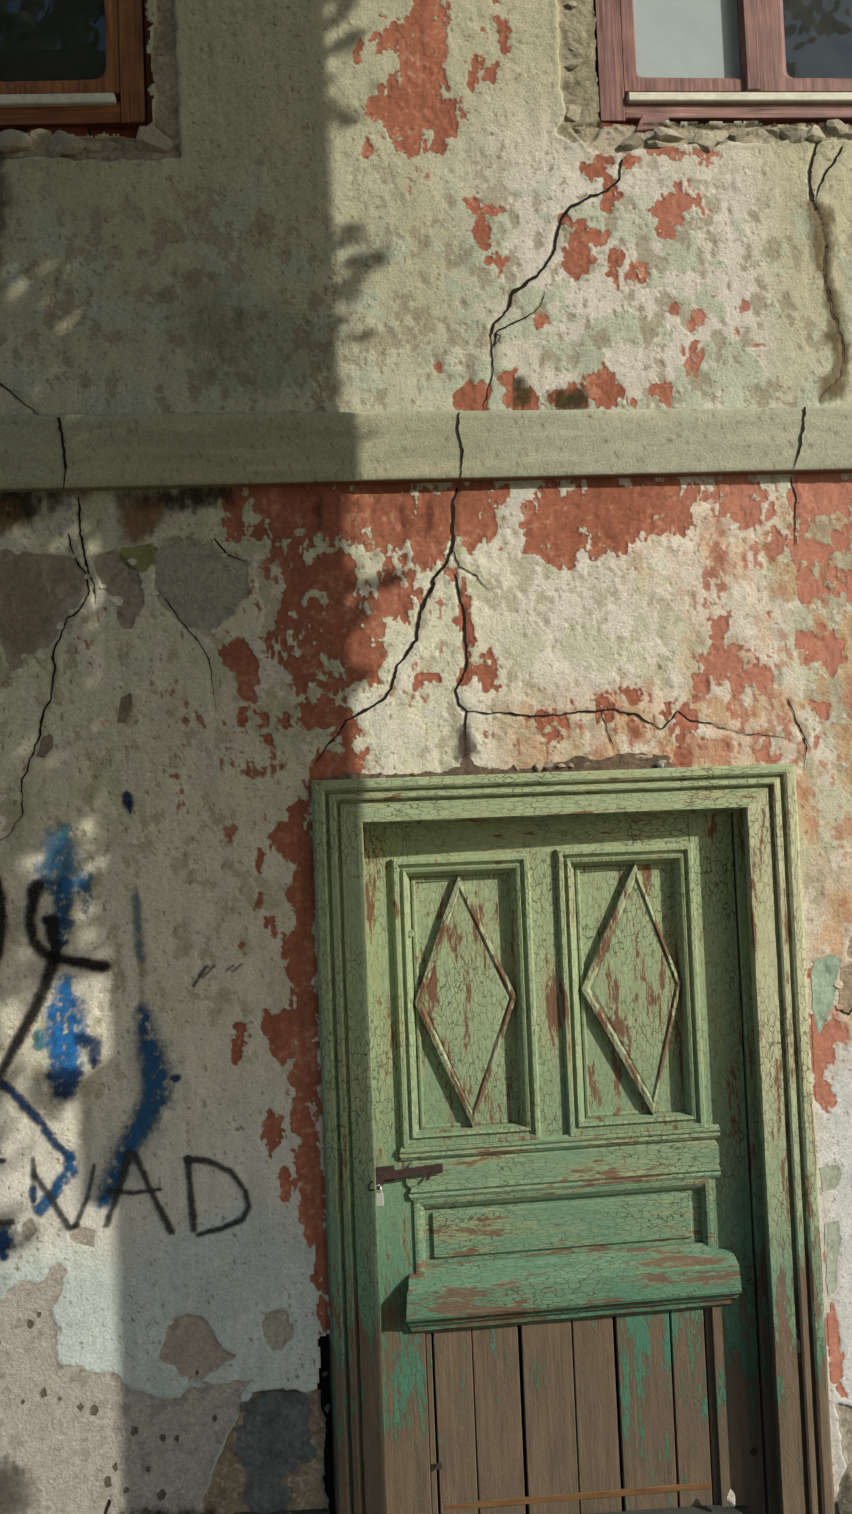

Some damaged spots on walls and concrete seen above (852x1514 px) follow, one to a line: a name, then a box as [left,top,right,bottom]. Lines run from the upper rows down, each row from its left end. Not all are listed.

peeling [353,0,513,159]
crack [0,383,96,841]
peeling [0,473,852,780]
crack [315,159,811,765]
crack [790,143,845,544]
peeling [231,798,326,1332]
peeling [809,937,852,1113]
peeling [0,1262,330,1514]
spalling [824,1220,852,1500]